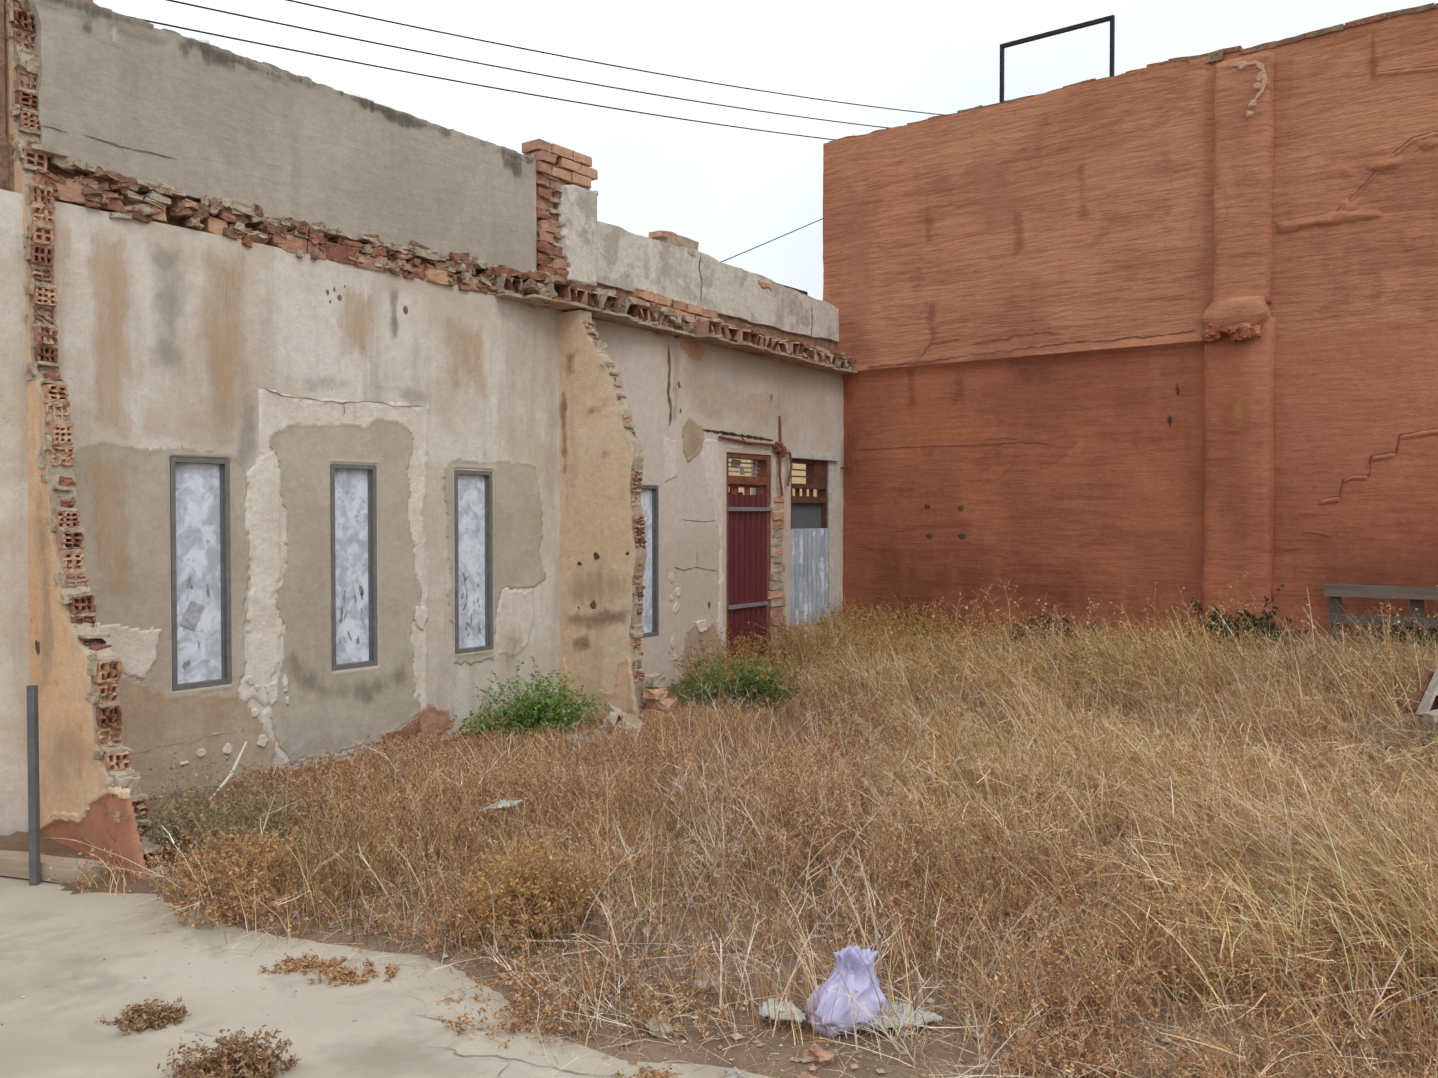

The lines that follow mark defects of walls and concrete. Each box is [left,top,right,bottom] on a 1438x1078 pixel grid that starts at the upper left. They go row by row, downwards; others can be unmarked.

peeling [1229,60,1267,118]
crack [1332,130,1438,213]
crack [867,330,1195,367]
peeling [4,0,546,880]
spalling [583,310,647,719]
crack [1281,427,1438,552]